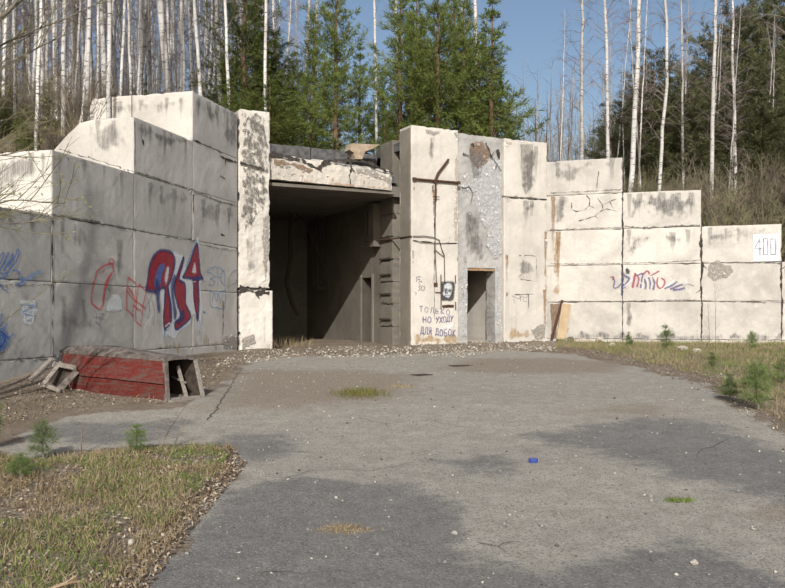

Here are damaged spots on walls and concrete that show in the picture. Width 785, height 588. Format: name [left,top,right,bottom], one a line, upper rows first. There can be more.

spalling [241,113,313,278]
spalling [356,167,390,184]
rust [412,177,461,201]
water stain [523,151,534,191]
peeling [454,141,511,334]
crack [571,171,625,338]
spalling [707,260,743,281]